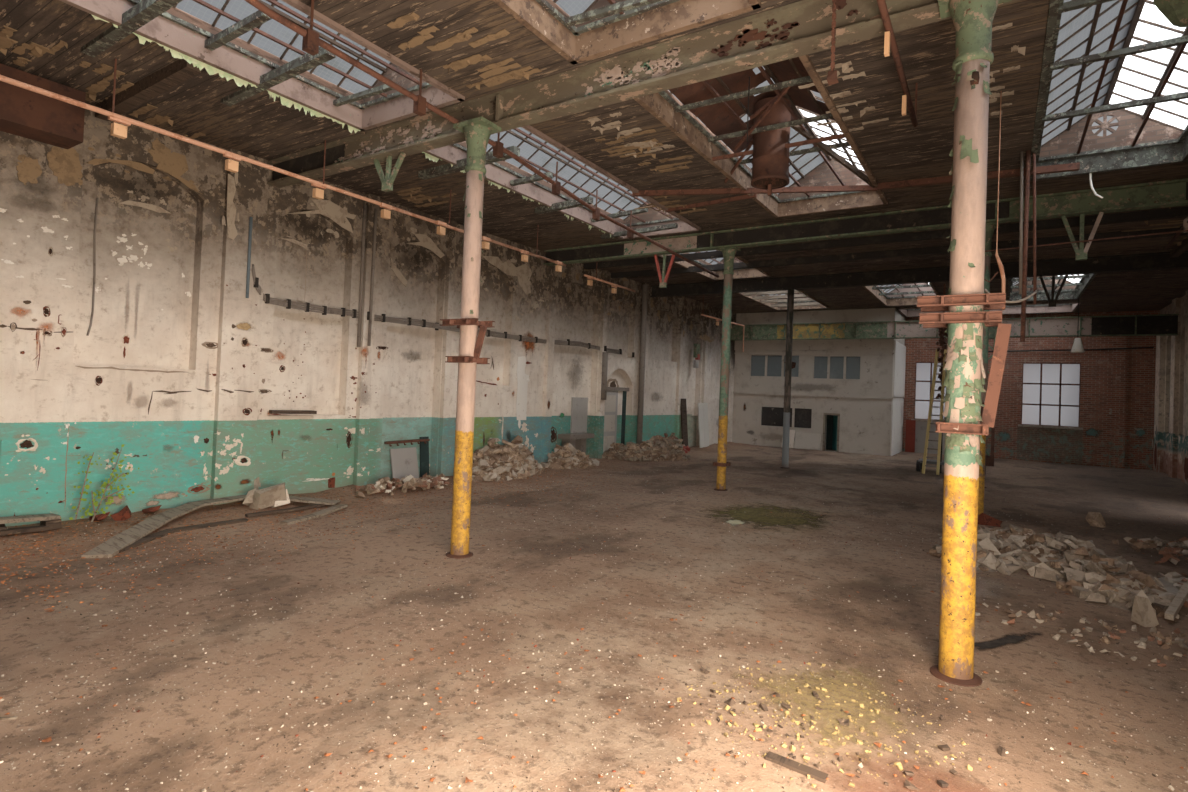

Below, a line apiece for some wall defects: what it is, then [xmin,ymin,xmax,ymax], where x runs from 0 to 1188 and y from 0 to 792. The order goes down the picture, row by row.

peeling [398,134,466,173]
peeling [111,233,152,269]
spalling [5,434,56,493]
peeling [146,432,261,506]